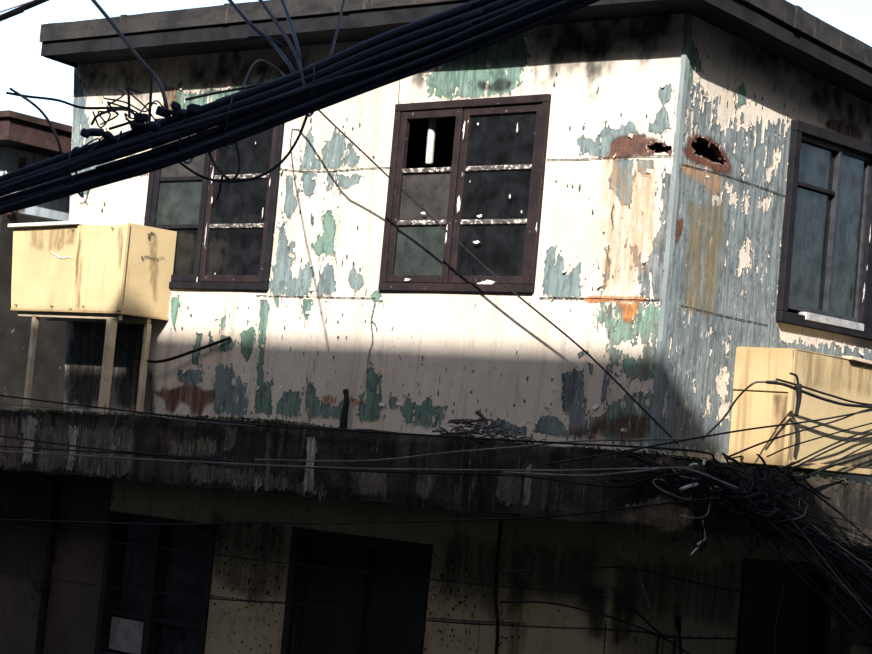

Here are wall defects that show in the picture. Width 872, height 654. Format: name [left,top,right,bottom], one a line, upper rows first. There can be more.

peeling [71,71,107,149]
damp [189,52,305,94]
peeling [422,31,534,108]
damp [478,79,511,90]
damp [538,14,669,75]
corrosion [609,133,672,159]
corrosion [684,134,731,190]
peeling [470,30,872,457]
peeling [168,117,455,502]
corrosion [585,296,645,321]